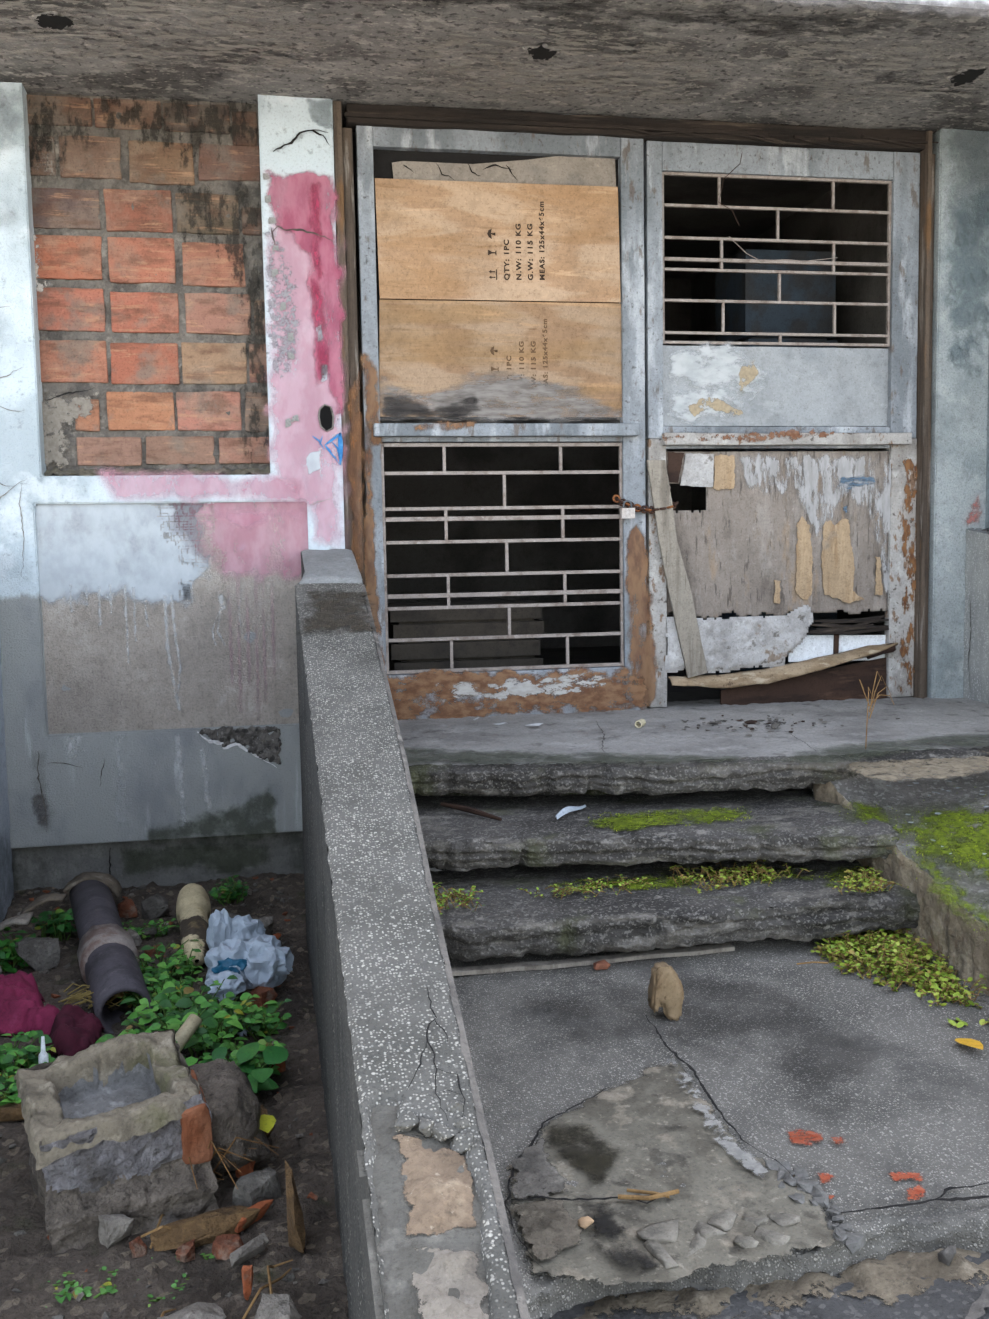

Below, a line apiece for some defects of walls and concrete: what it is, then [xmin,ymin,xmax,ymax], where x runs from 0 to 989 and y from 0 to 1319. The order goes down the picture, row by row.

peeling [265,196,299,377]
crack [0,478,28,577]
peeling [306,450,321,474]
spalling [318,404,334,432]
rust [347,353,658,720]
peeling [688,397,743,417]
peeling [741,453,891,593]
rust [898,458,917,695]
crack [407,988,466,1127]
crack [646,1015,792,1175]
spalling [357,1100,489,1319]
crack [833,1182,989,1214]